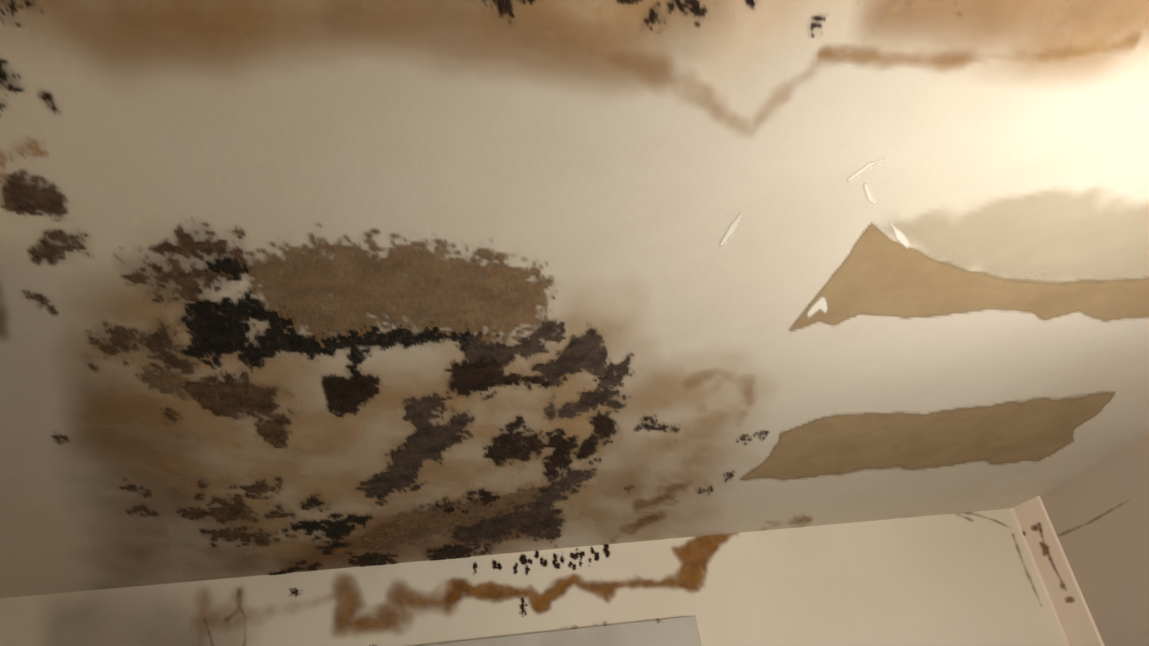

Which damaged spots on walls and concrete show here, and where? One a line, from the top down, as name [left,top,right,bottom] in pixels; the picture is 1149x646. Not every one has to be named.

leakage [113,0,285,44]
leakage [483,0,718,48]
leakage [1031,0,1149,62]
leakage [0,60,22,92]
leakage [42,93,56,112]
leakage [1,171,87,265]
leakage [23,291,58,315]
leakage [89,224,634,575]
leakage [635,416,722,448]